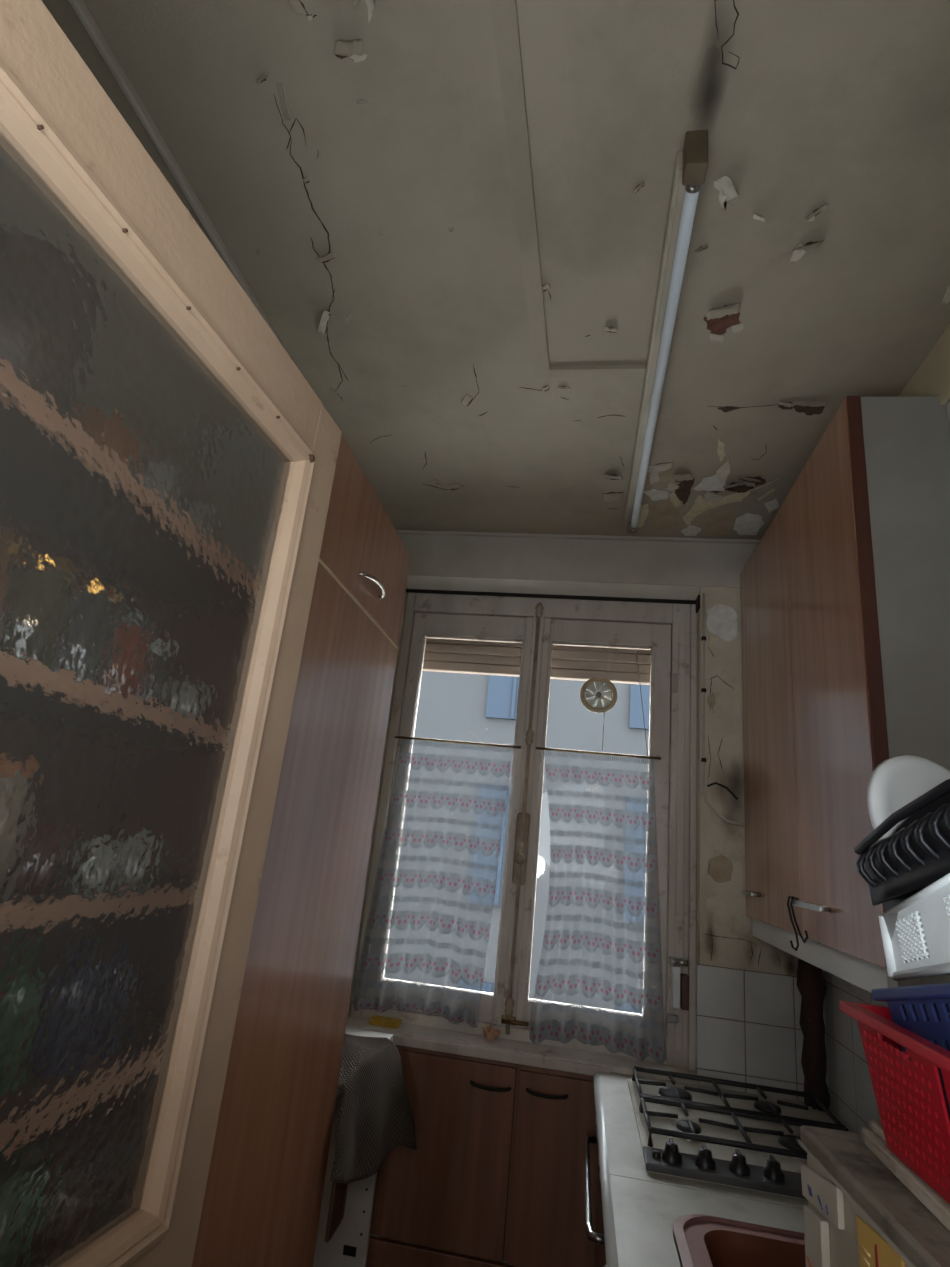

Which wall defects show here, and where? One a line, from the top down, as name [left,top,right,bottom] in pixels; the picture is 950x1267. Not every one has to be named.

crack [714,0,740,70]
peeling [714,175,739,210]
crack [255,73,351,400]
flaking render [703,303,744,343]
peeling [637,426,779,536]